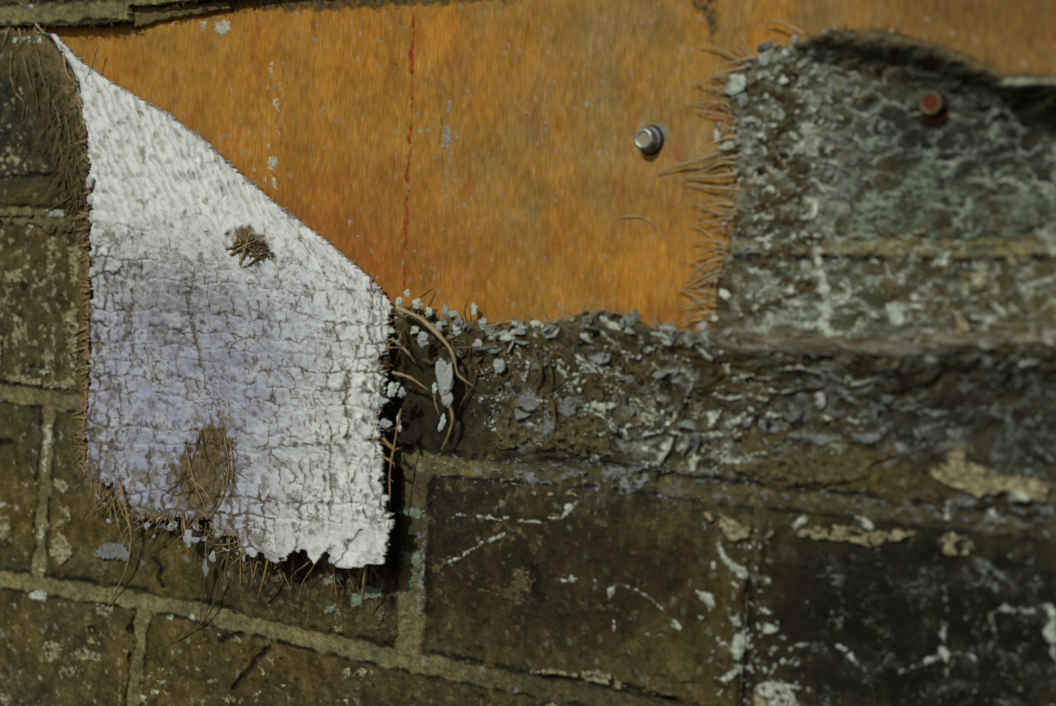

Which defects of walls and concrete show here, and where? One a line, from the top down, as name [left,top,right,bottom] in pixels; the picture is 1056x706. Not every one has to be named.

peeling [199,19,231,35]
spalling [384,37,1056,706]
peeling [366,373,390,461]
peeling [106,510,178,539]
peeling [191,521,207,544]